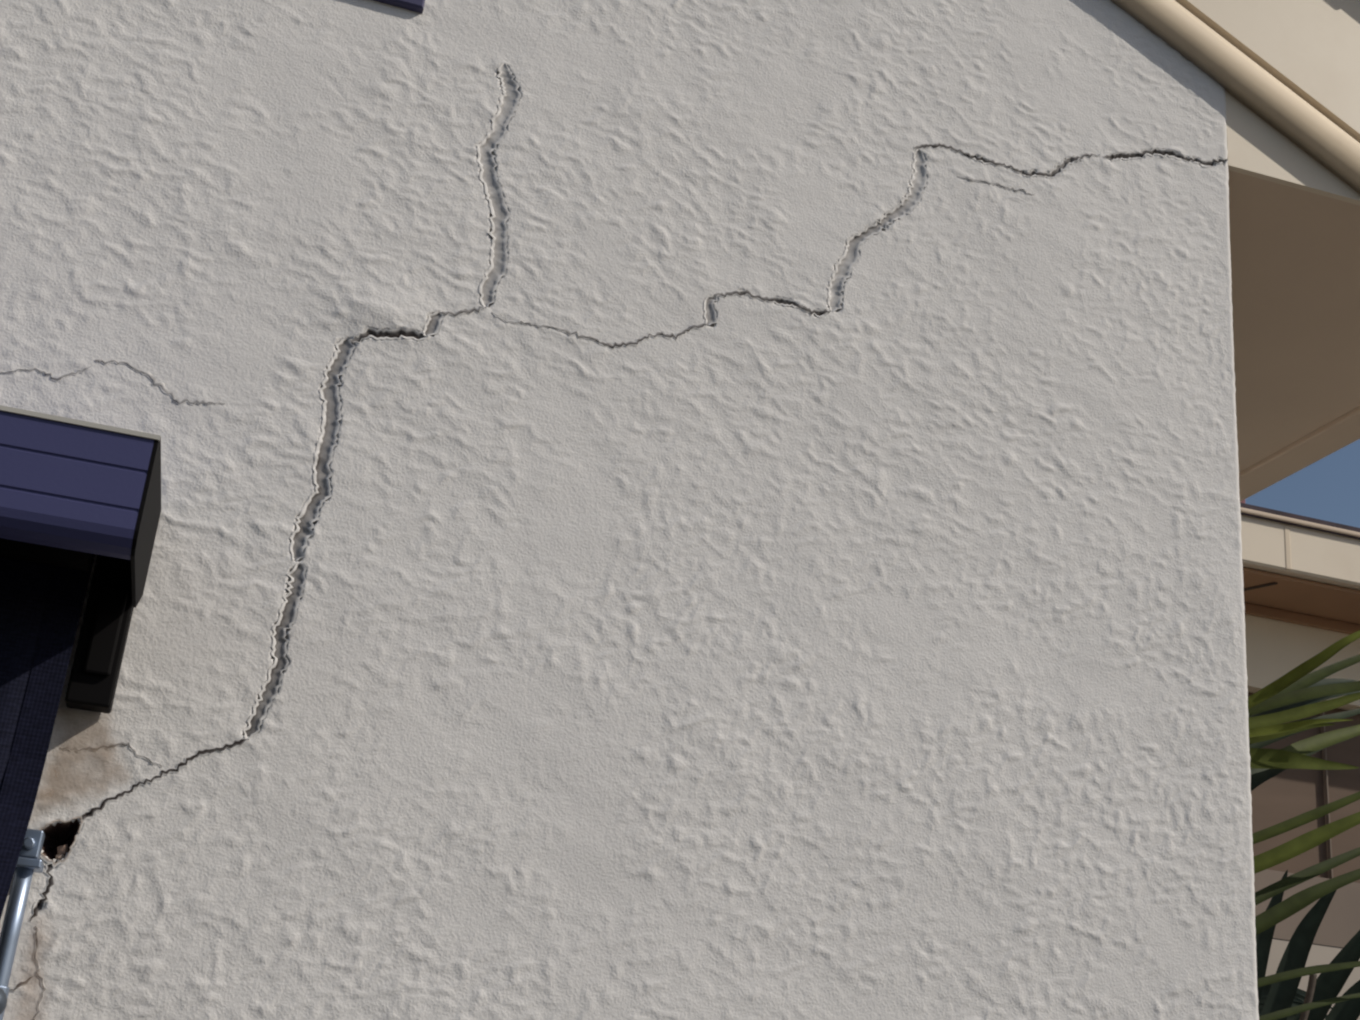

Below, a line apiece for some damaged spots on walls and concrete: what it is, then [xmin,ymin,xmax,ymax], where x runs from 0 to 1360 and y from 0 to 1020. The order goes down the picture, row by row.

crack [0,359,225,405]
crack [60,63,1228,825]
crack [9,859,59,1020]